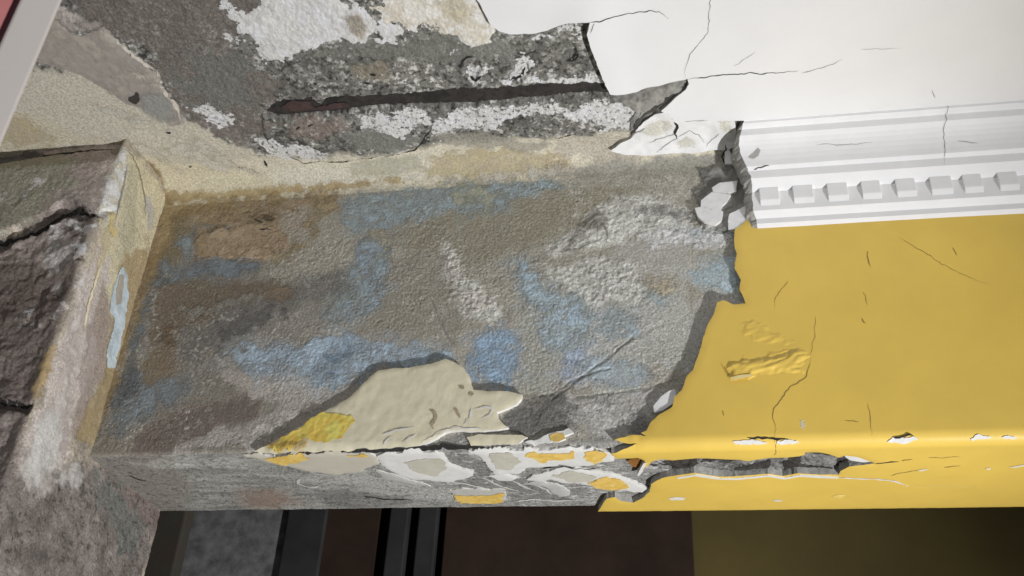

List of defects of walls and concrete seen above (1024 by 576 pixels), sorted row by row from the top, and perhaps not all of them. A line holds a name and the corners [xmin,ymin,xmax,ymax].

crack [589,10,666,32]
crack [684,0,893,79]
crack [611,110,736,156]
crack [0,148,120,272]
flaking render [0,0,909,511]
crack [772,317,816,450]